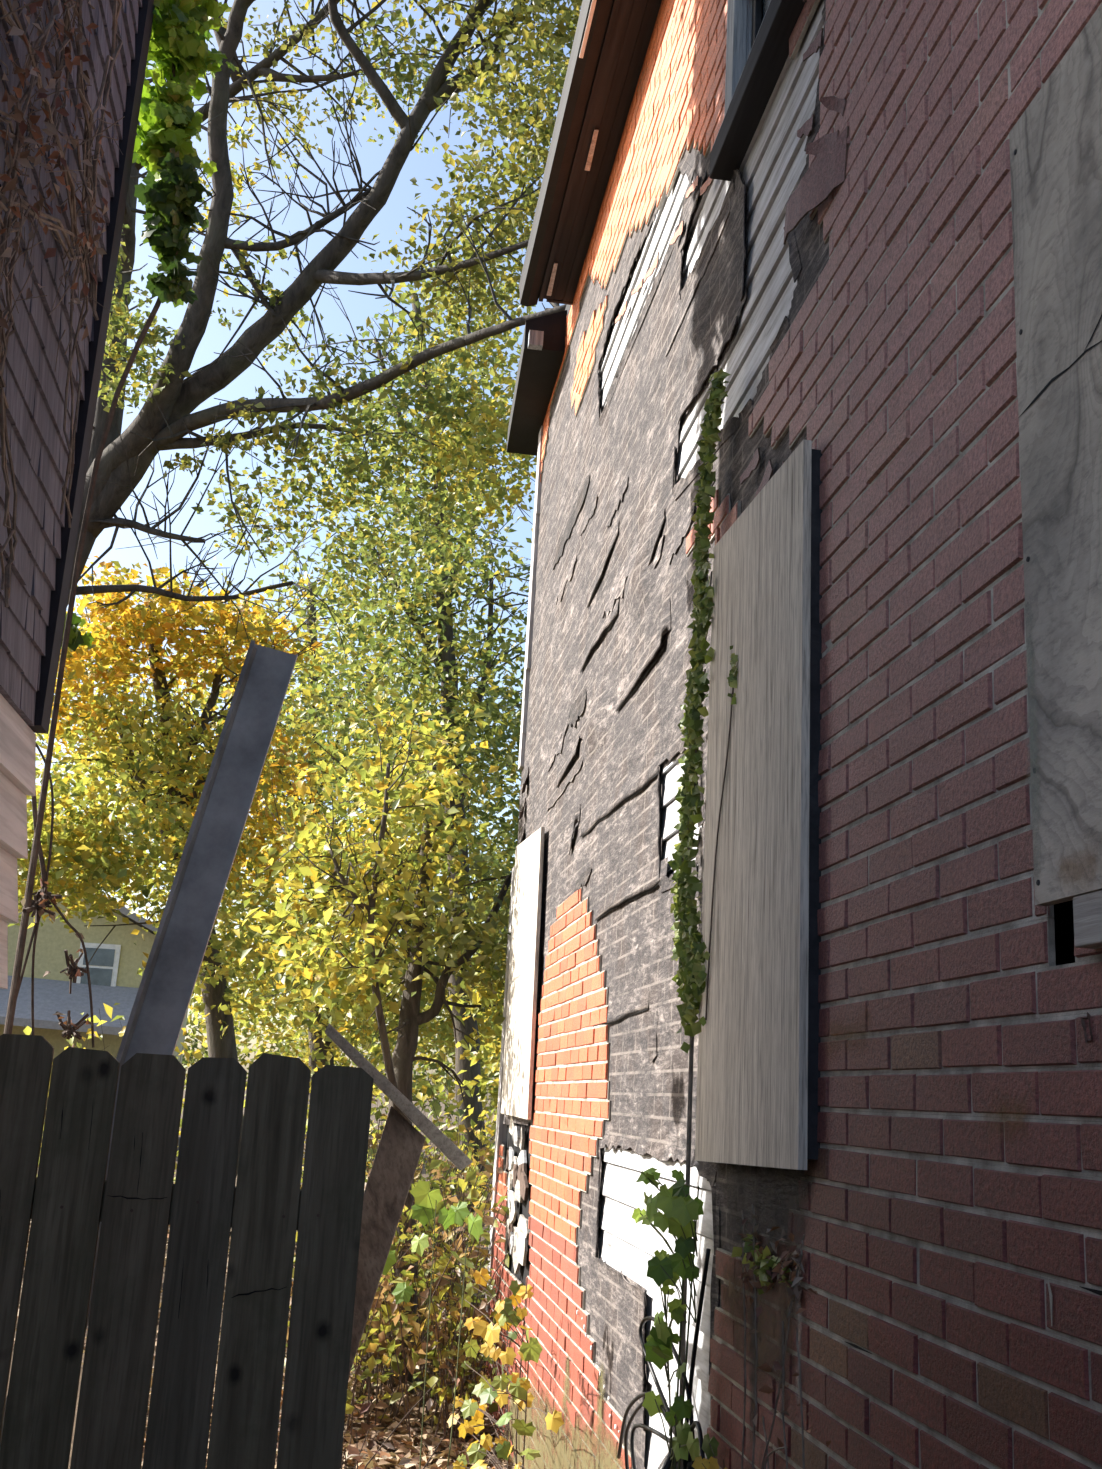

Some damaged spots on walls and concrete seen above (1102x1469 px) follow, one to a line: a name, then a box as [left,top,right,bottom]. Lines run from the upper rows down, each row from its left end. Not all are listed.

peeling [784,226,802,283]
peeling [770,316,790,355]
peeling [553,475,628,605]
peeling [602,398,753,619]
peeling [740,448,774,498]
peeling [547,689,587,811]
peeling [574,867,592,893]
spalling [505,1116,532,1286]
peeling [595,1135,721,1431]
crack [1046,1276,1102,1326]